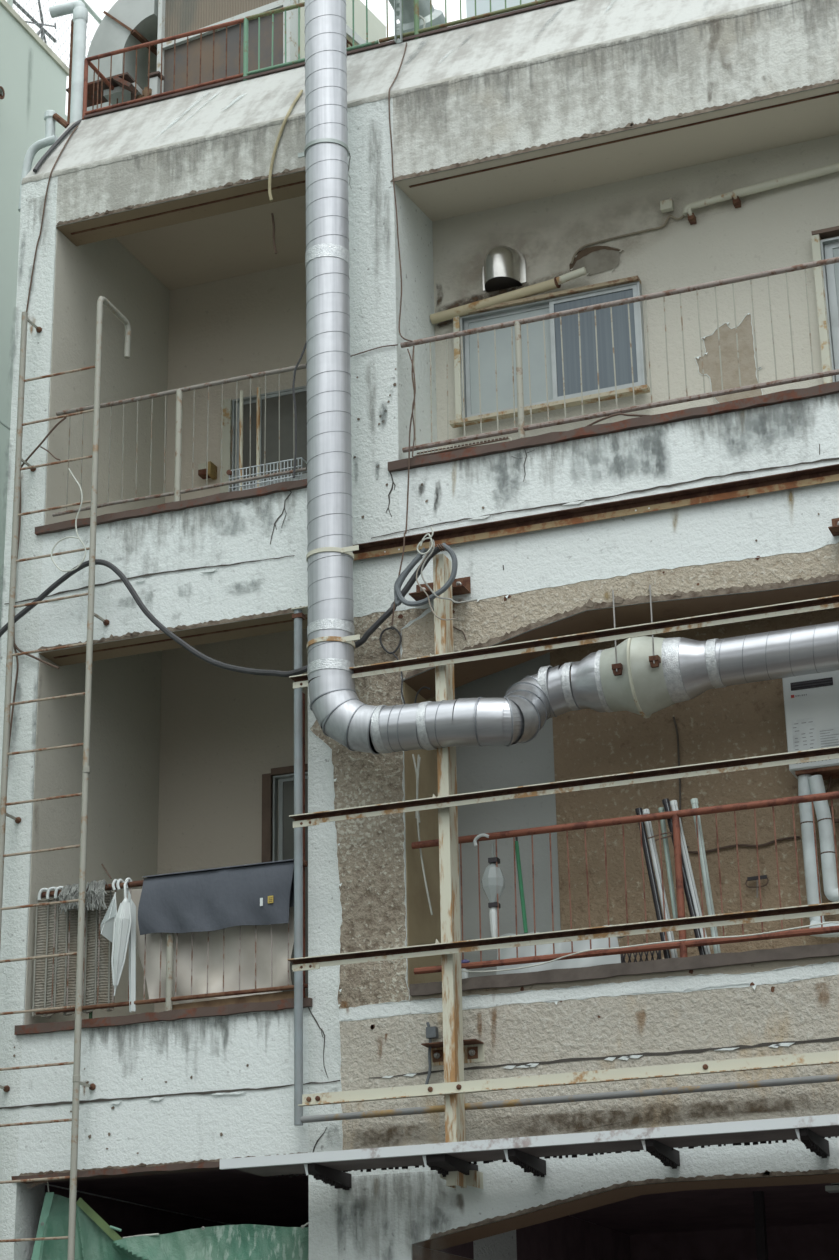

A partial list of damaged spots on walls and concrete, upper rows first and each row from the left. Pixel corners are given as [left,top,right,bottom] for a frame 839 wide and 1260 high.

peeling [695,313,763,403]